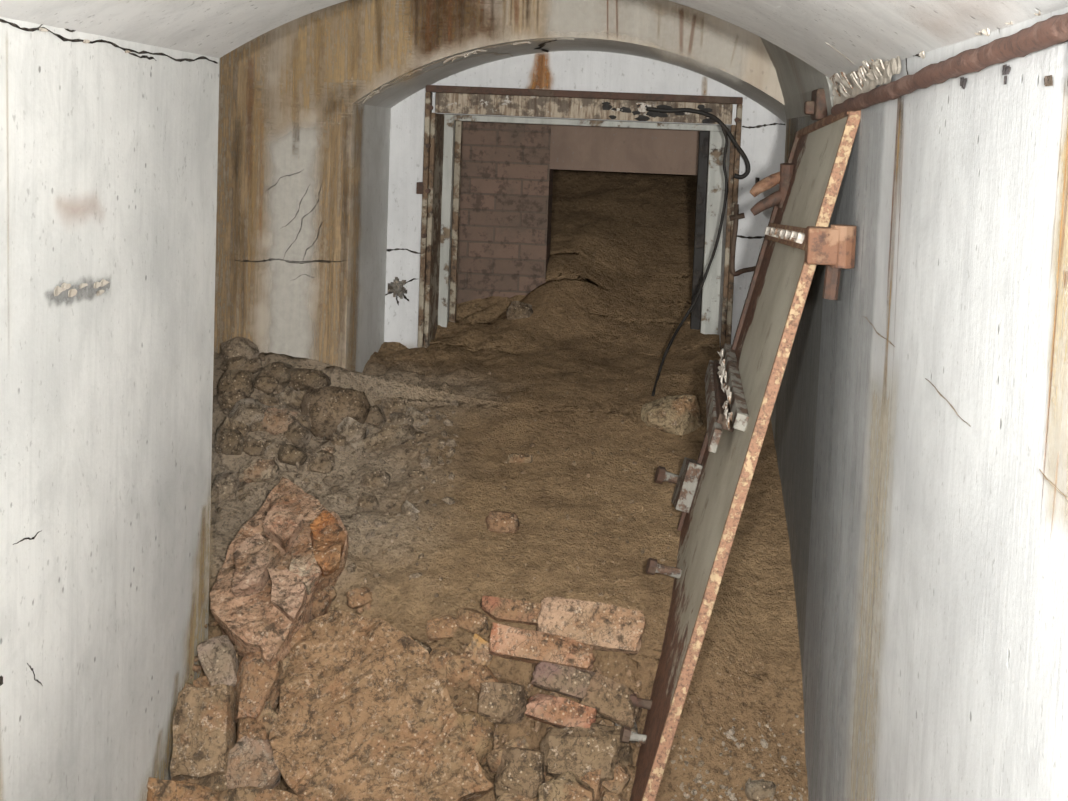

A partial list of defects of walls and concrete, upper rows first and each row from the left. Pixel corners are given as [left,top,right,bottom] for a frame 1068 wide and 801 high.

crack [0,19,218,64]
rust [412,0,493,54]
rust [530,54,551,89]
crack [229,171,347,280]
peeling [50,279,110,304]
rust [1043,123,1068,483]